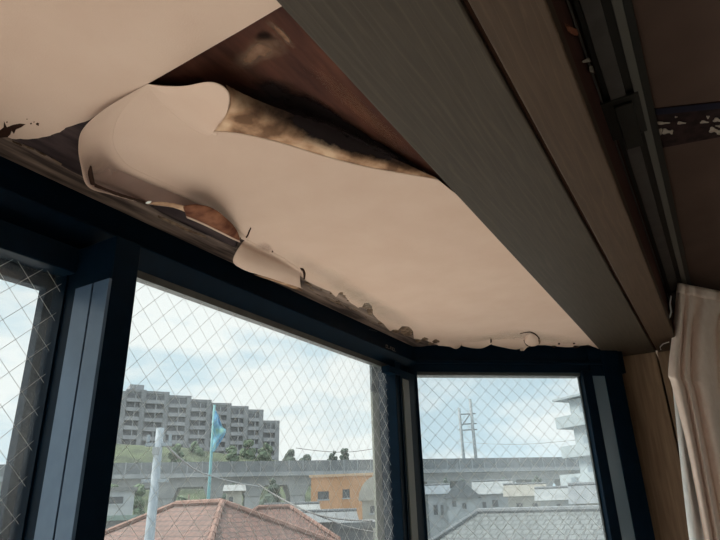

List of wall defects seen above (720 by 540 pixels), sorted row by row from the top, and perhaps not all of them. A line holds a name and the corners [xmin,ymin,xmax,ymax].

damp [253,81,419,170]
peeling [657,116,686,135]
peeling [700,116,720,135]
spalling [146,201,238,248]
spalling [392,326,440,345]